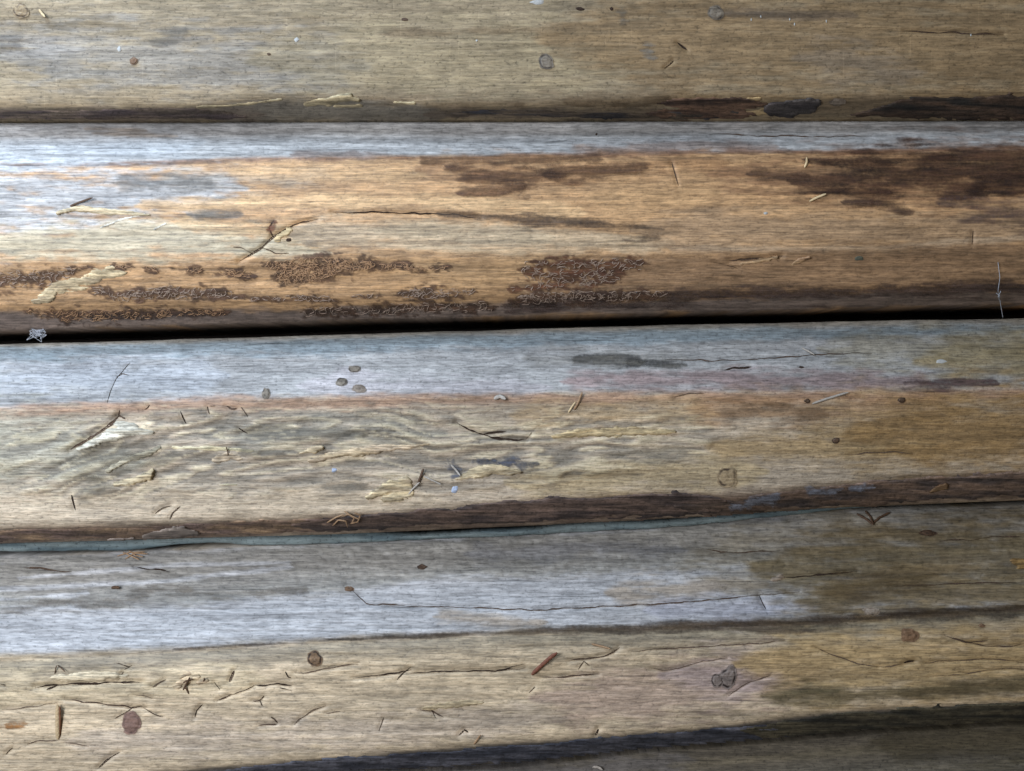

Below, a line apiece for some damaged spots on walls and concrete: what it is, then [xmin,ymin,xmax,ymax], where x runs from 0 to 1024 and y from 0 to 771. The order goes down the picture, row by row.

leakage [420,154,648,196]
leakage [790,138,1024,215]
crack [344,210,474,218]
crack [353,571,856,611]